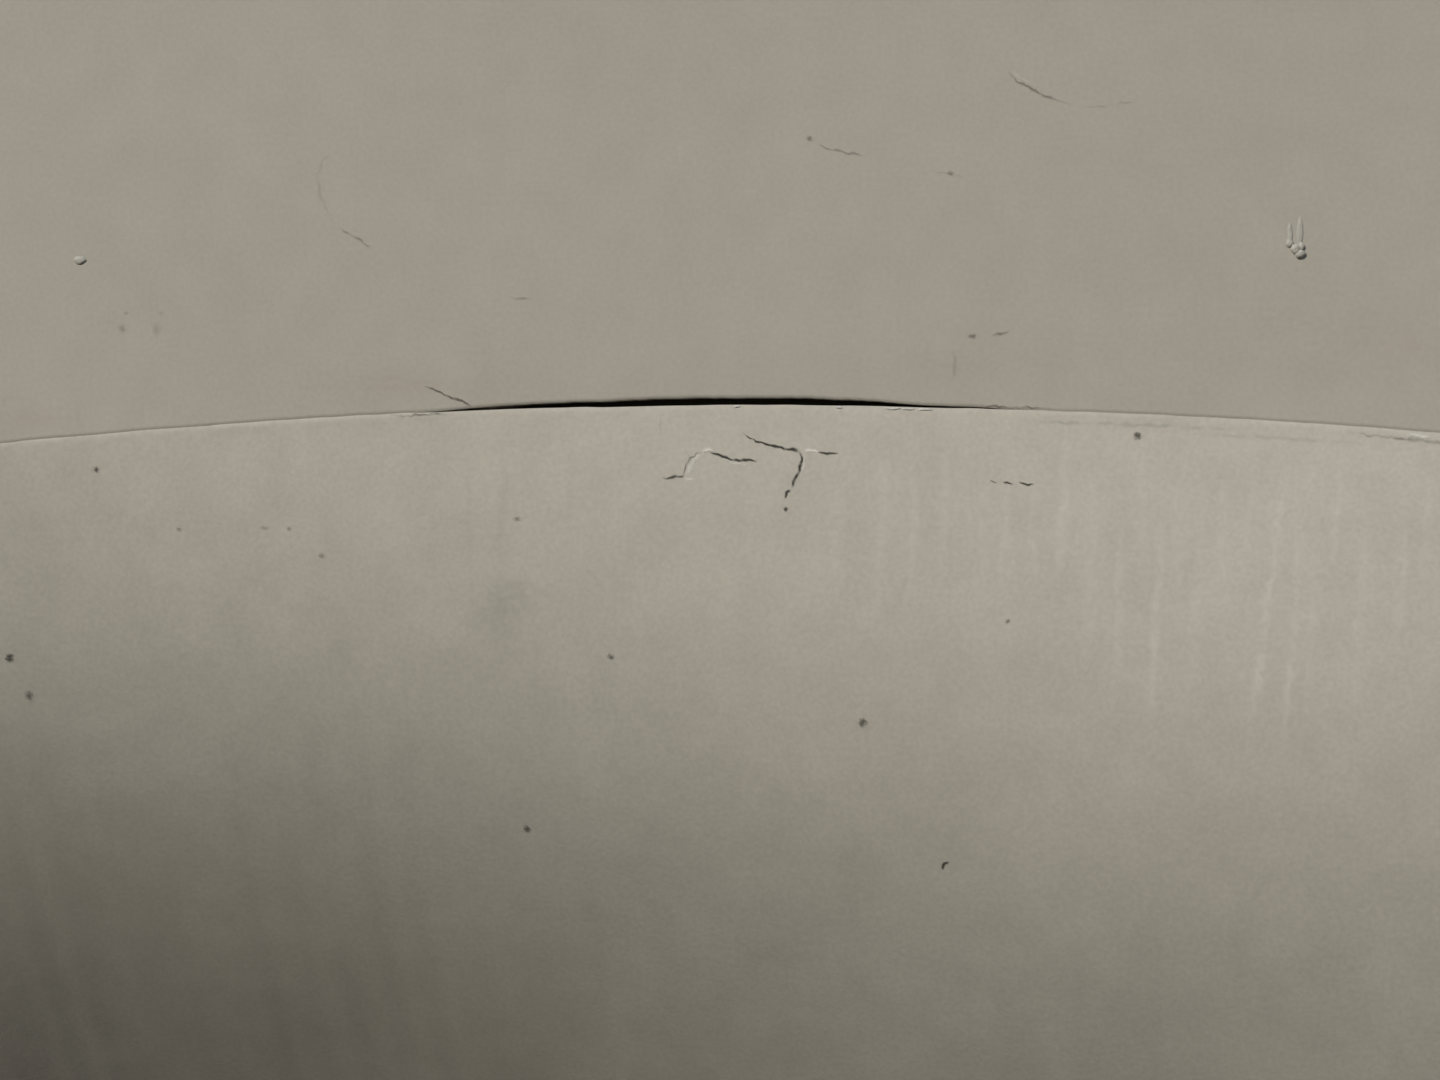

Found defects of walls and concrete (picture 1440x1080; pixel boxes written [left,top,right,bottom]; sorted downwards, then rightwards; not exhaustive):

crack [414,388,1031,511]